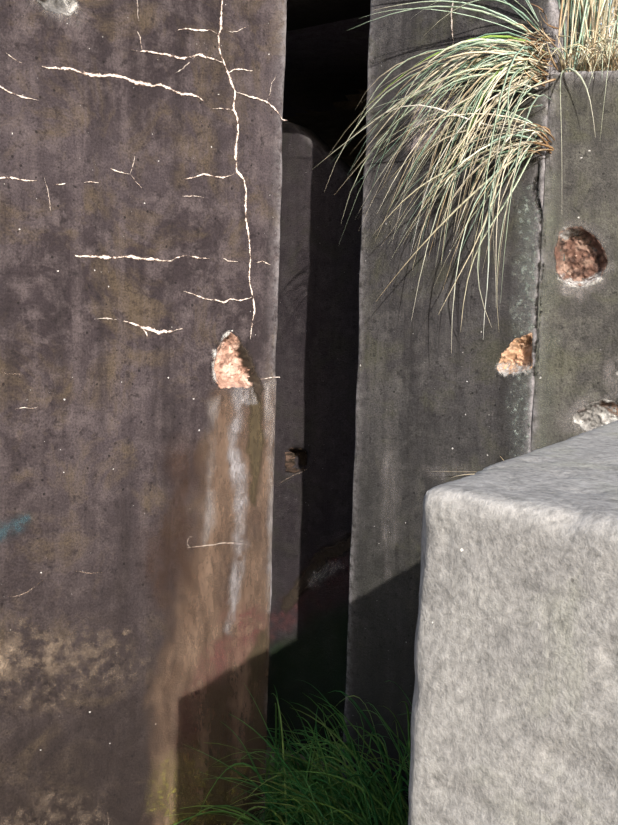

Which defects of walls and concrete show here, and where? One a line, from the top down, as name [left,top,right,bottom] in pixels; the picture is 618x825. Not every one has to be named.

spalling [37,0,77,16]
crack [0,158,141,210]
crack [42,0,287,339]
spalling [554,226,608,288]
spalling [212,332,264,401]
spalling [497,333,533,377]
spalling [572,399,618,432]